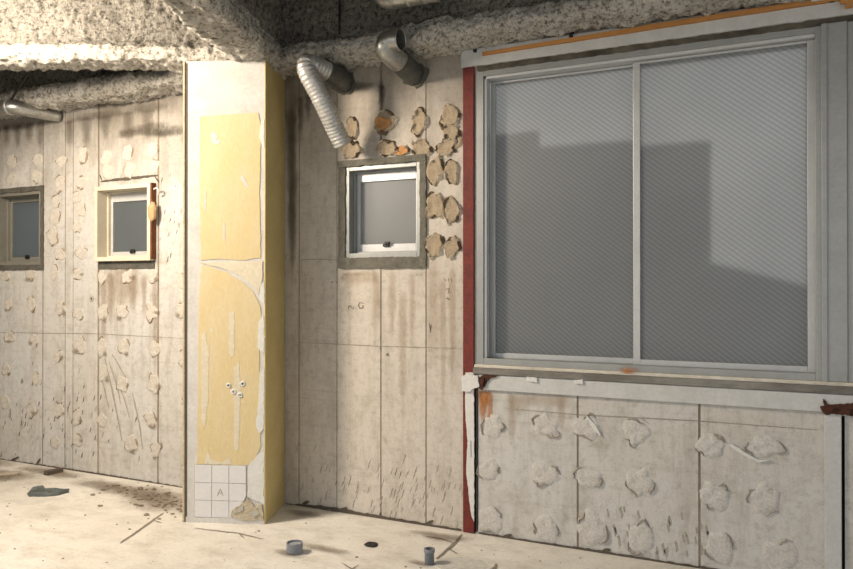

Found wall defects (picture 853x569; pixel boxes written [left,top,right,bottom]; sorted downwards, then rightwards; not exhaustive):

peeling [340,116,364,158]
peeling [373,106,429,157]
flaking render [100,150,113,180]
spalling [425,103,463,226]
flaking render [46,145,88,247]
peeling [424,235,462,260]
flaking render [25,270,37,282]
flaking render [122,268,133,284]
peeling [197,113,265,521]
flaking render [3,384,102,458]
rust [478,374,498,417]
rust [820,399,853,416]